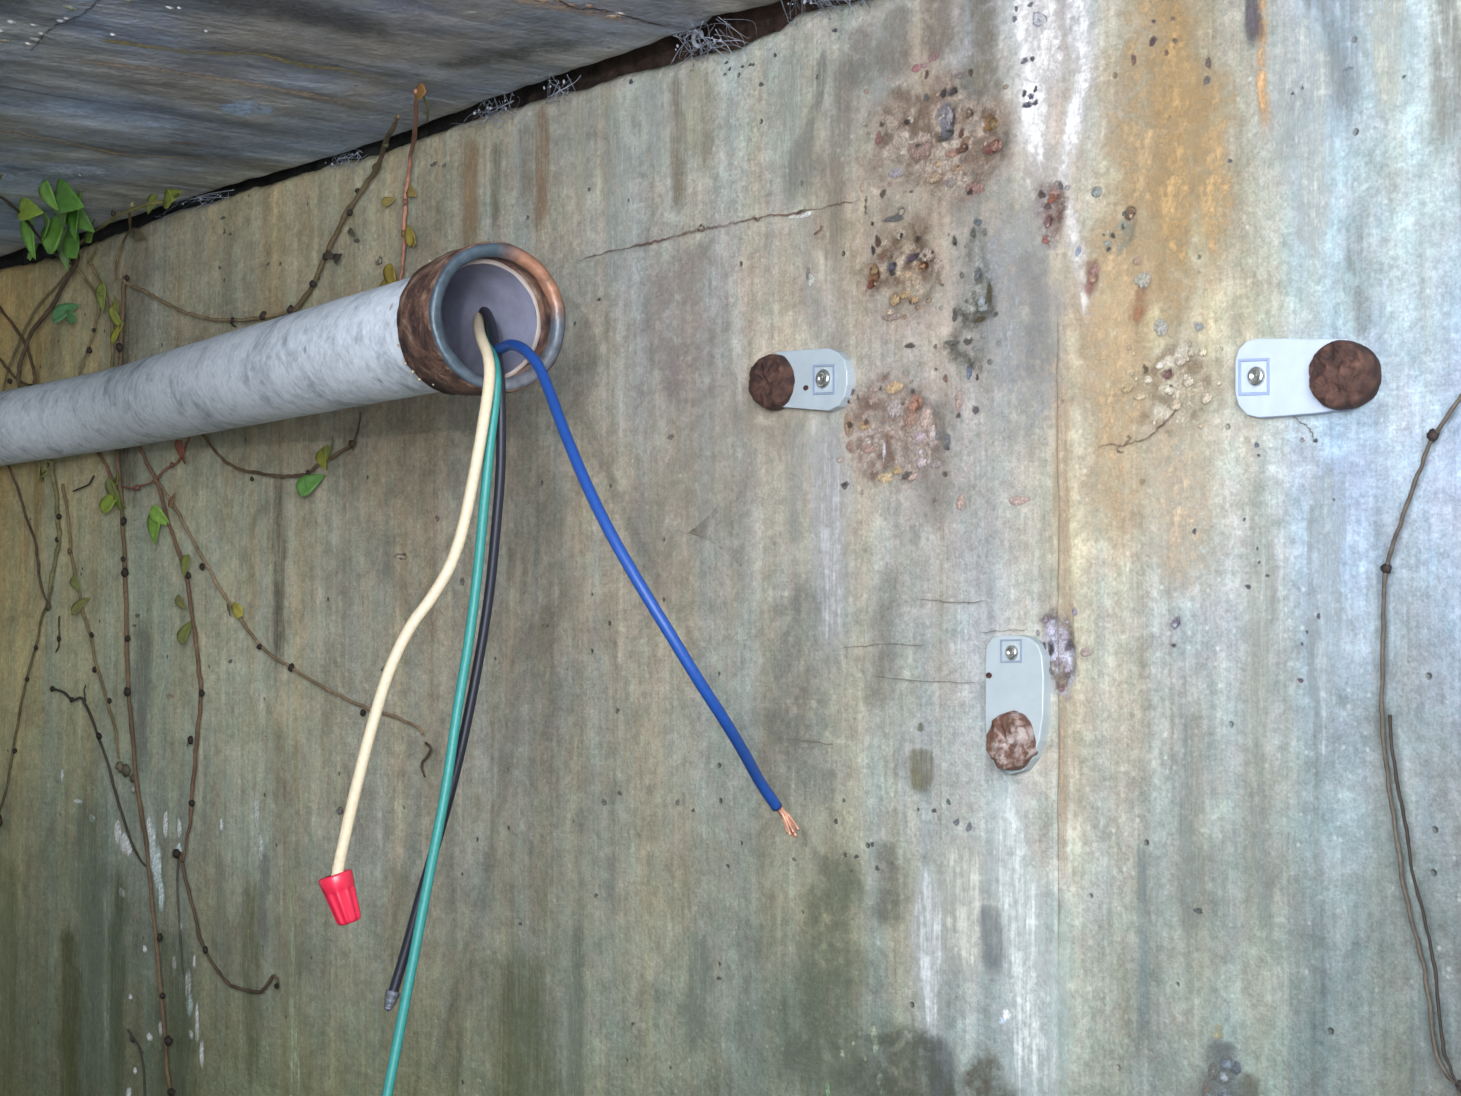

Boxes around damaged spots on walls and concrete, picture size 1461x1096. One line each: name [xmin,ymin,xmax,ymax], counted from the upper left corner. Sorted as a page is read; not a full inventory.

crack [34,0,100,47]
crack [586,197,867,287]
spalling [860,69,1038,418]
peeling [836,373,950,495]
spalling [1036,607,1092,694]
damp [869,794,1065,1096]